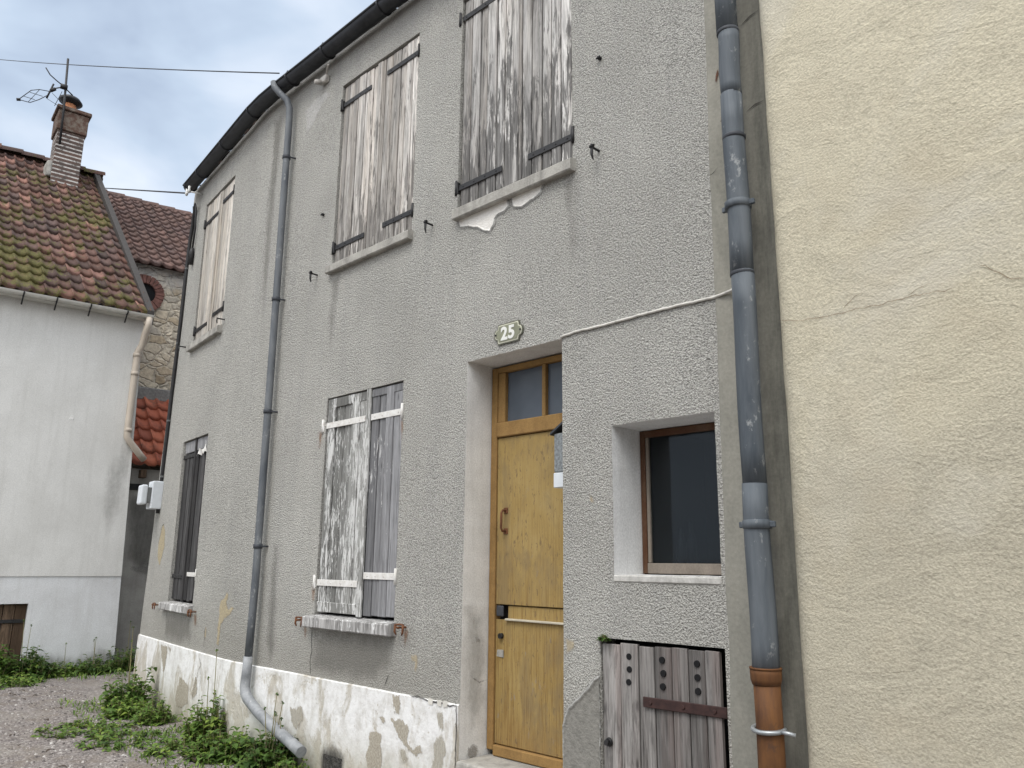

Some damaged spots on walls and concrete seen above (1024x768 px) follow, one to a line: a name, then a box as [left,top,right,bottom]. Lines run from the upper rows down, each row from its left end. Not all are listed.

flaking render [458,185,544,234]
crack [783,284,952,321]
peeling [161,645,171,671]
peeling [175,677,197,708]
peeling [290,706,303,729]
peeling [366,695,421,768]